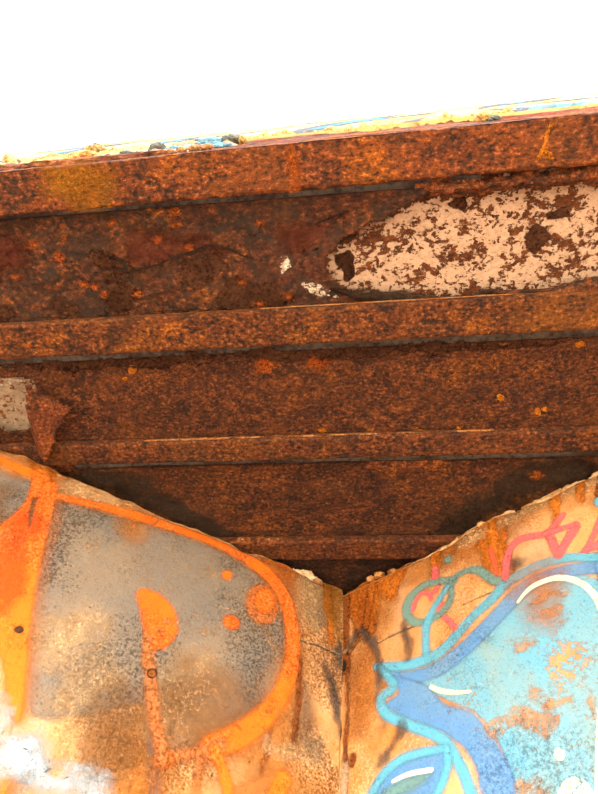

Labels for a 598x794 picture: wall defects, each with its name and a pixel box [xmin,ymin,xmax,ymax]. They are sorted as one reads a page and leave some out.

peeling [0,142,197,171]
rust [415,108,598,198]
rust [80,229,296,313]
spalling [326,182,598,301]
rust [257,358,275,373]
spalling [0,377,36,432]
rust [16,384,77,494]
spalling [36,464,170,523]
rust [369,459,443,474]
spalling [408,471,598,566]
rust [262,558,298,587]
spalling [293,568,317,582]